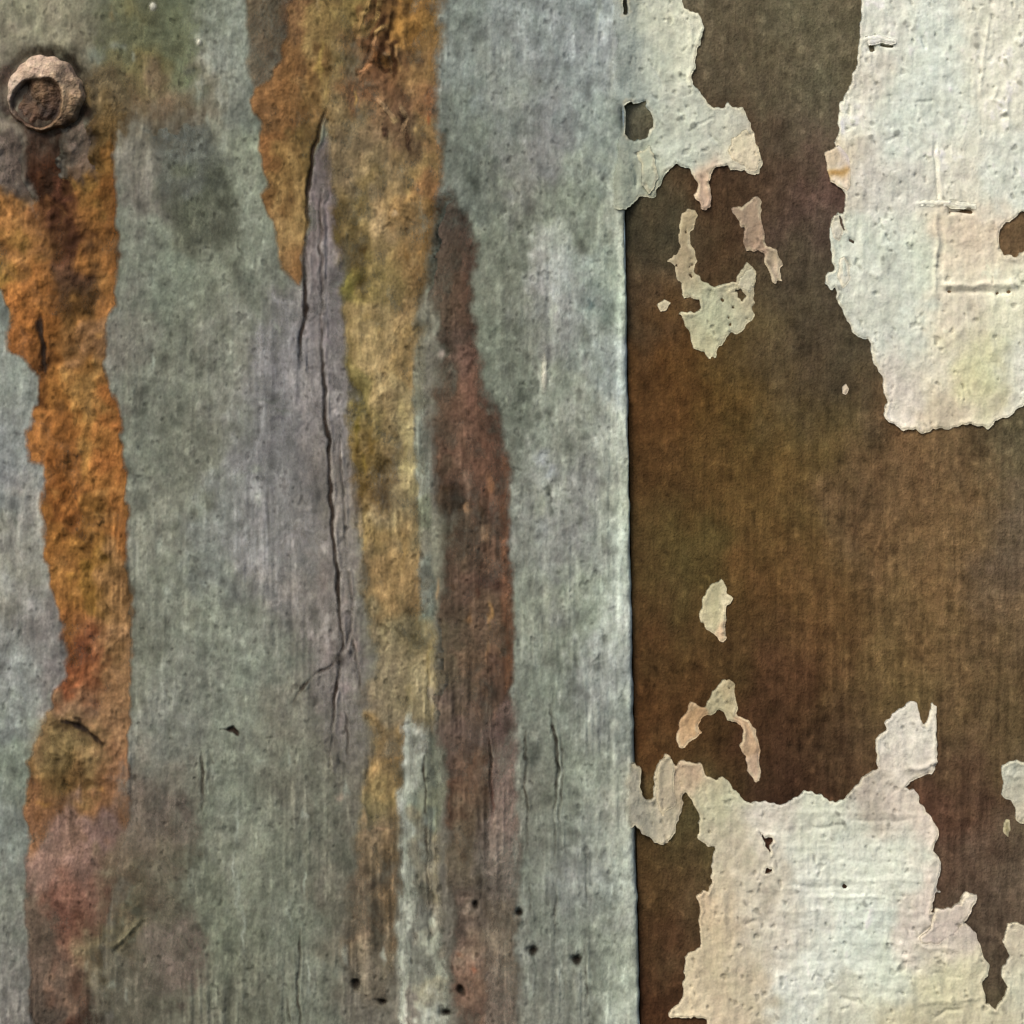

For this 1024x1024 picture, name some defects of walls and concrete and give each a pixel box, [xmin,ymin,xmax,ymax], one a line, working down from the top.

crack [299,280,309,349]
crack [304,126,320,239]
peeling [613,0,783,359]
peeling [824,0,1024,434]
rust [0,45,202,1024]
crack [301,363,354,739]
rust [246,0,519,1024]
peeling [699,579,733,642]
peeling [626,679,1024,1024]